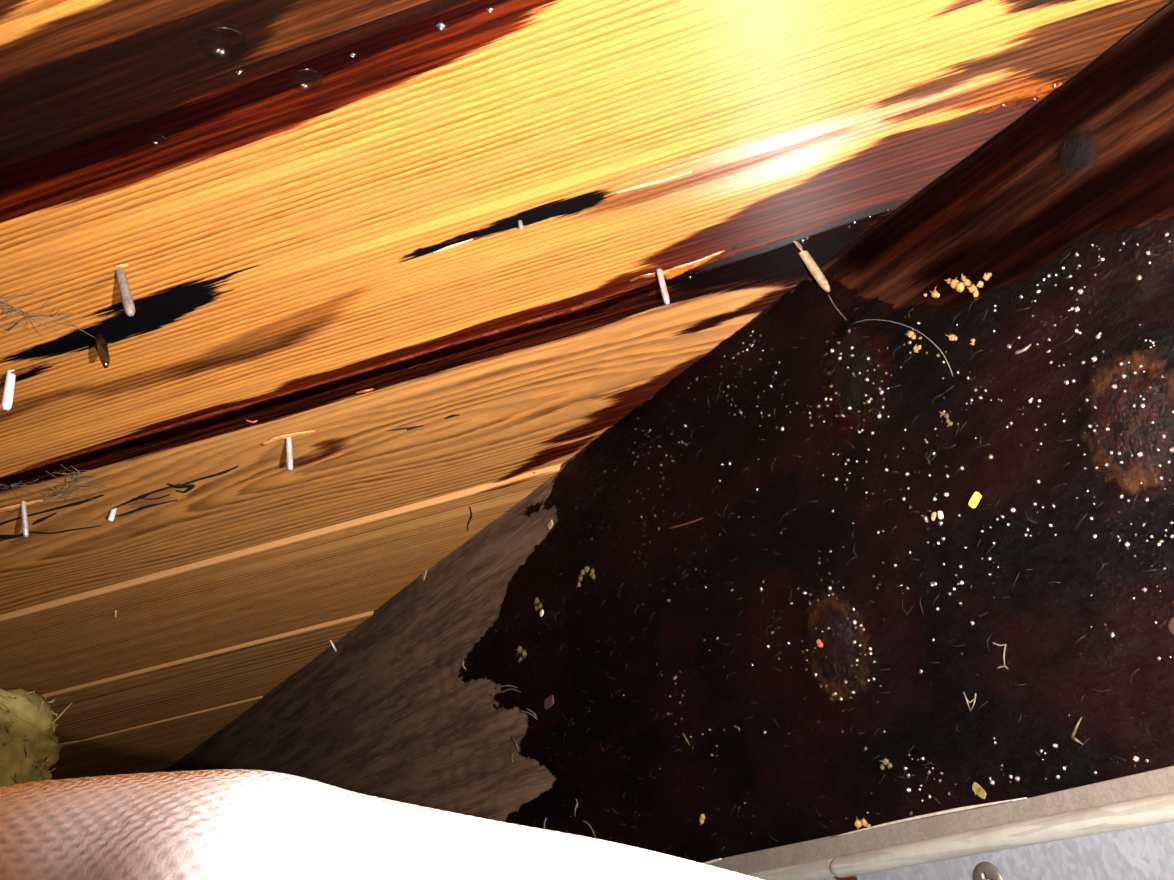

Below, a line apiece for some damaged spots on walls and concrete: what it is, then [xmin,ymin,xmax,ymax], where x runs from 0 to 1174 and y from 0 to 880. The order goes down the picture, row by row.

water stain [0,0,1174,492]
crack [0,466,239,541]
water stain [520,498,544,517]